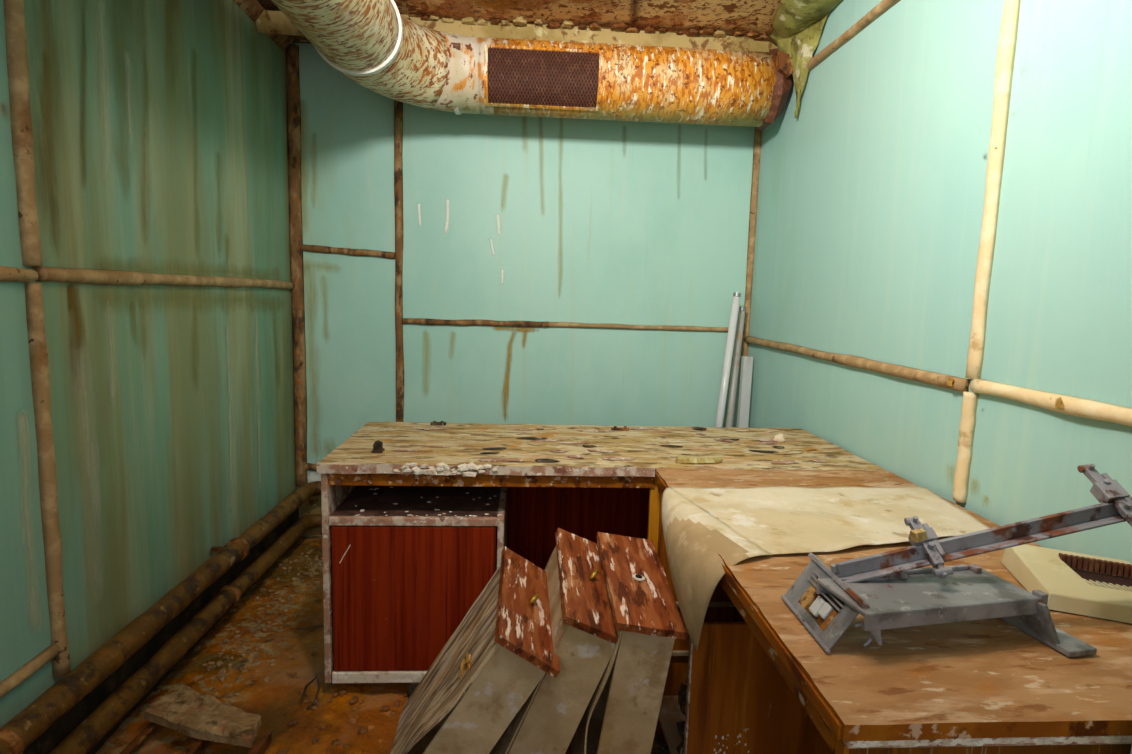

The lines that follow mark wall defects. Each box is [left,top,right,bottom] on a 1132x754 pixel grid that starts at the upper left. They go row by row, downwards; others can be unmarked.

peeling [401,0,842,118]
rust [571,0,750,36]